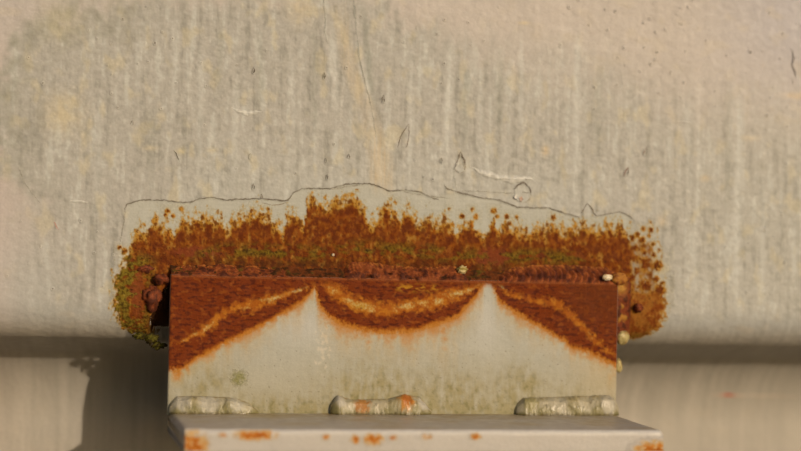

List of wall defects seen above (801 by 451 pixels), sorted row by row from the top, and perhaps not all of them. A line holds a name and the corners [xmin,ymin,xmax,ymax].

leakage [0,0,801,329]
corrosion [107,187,675,398]
corrosion [185,428,284,451]
corrosion [348,431,399,448]
corrosion [627,436,663,451]